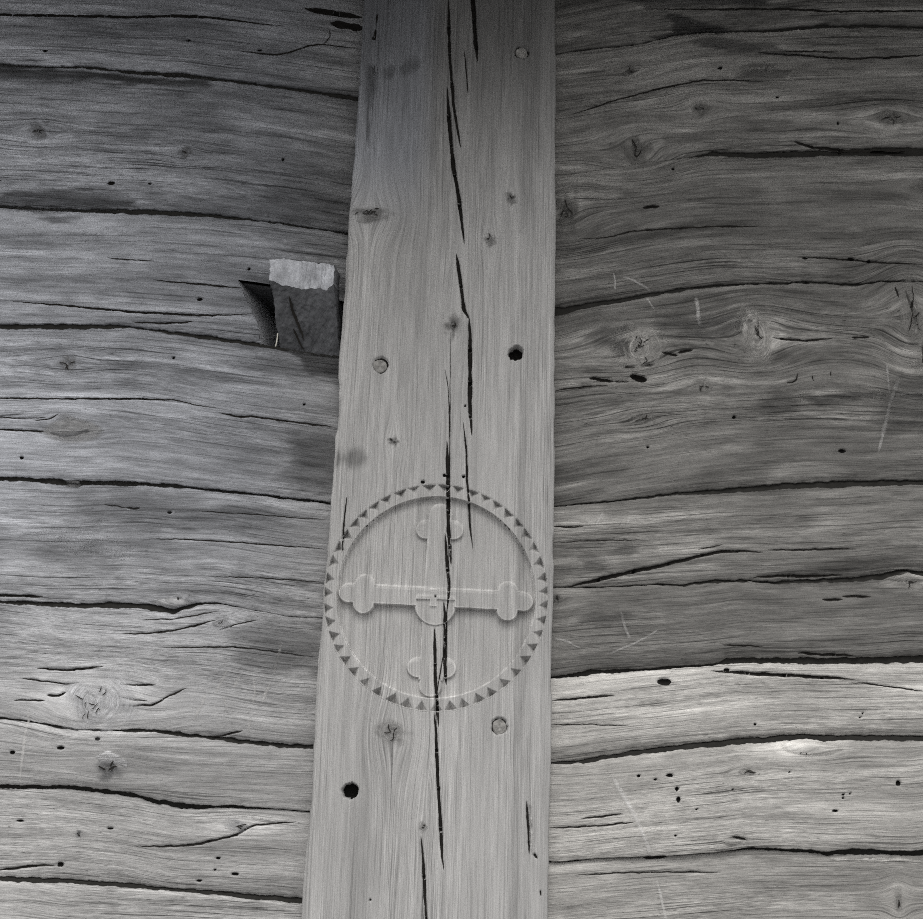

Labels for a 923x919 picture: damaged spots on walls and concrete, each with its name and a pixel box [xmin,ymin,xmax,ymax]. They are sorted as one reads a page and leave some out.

crack [421,0,478,919]
crack [526,802,636,859]
crack [579,856,717,875]